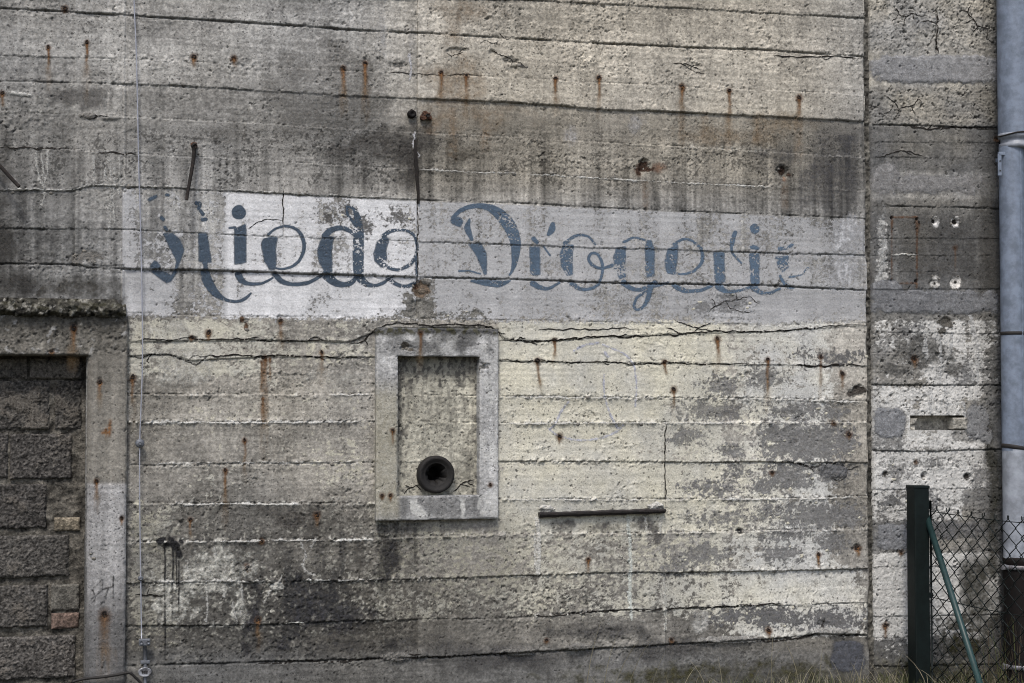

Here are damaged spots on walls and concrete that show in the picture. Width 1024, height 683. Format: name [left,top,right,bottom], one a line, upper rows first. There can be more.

crack [892,2,994,53]
water stain [328,129,516,177]
water stain [531,172,766,188]
crack [130,293,863,365]
water stain [146,501,400,655]